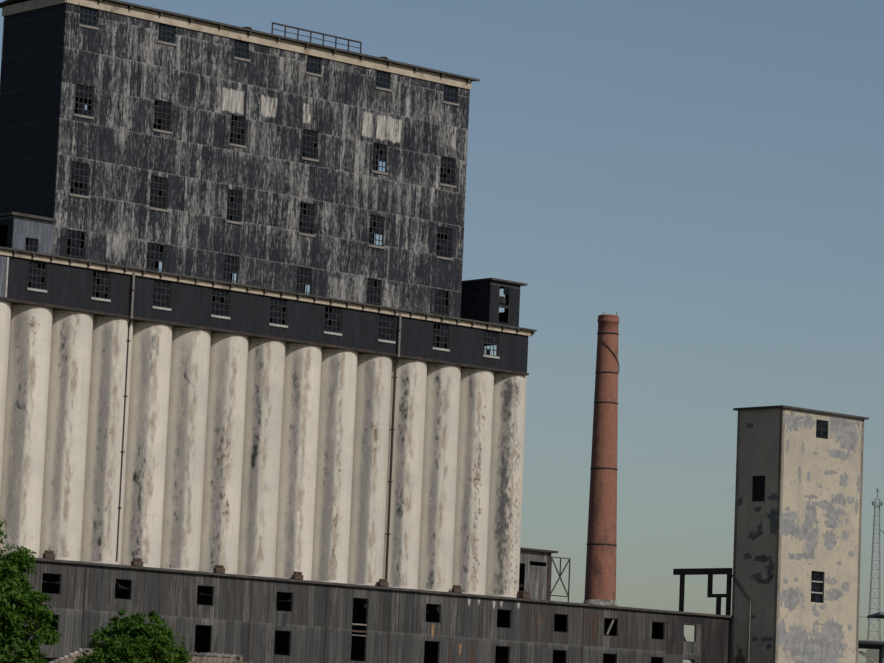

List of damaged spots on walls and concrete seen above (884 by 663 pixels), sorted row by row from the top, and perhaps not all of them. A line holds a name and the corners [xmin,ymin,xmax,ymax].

water stain [7,316,34,552]
water stain [131,420,153,556]
water stain [247,348,262,575]
water stain [393,373,408,587]
water stain [493,379,518,607]
peeling [783,411,816,453]
peeling [747,466,861,566]
peeling [801,417,863,461]
peeling [744,553,854,663]